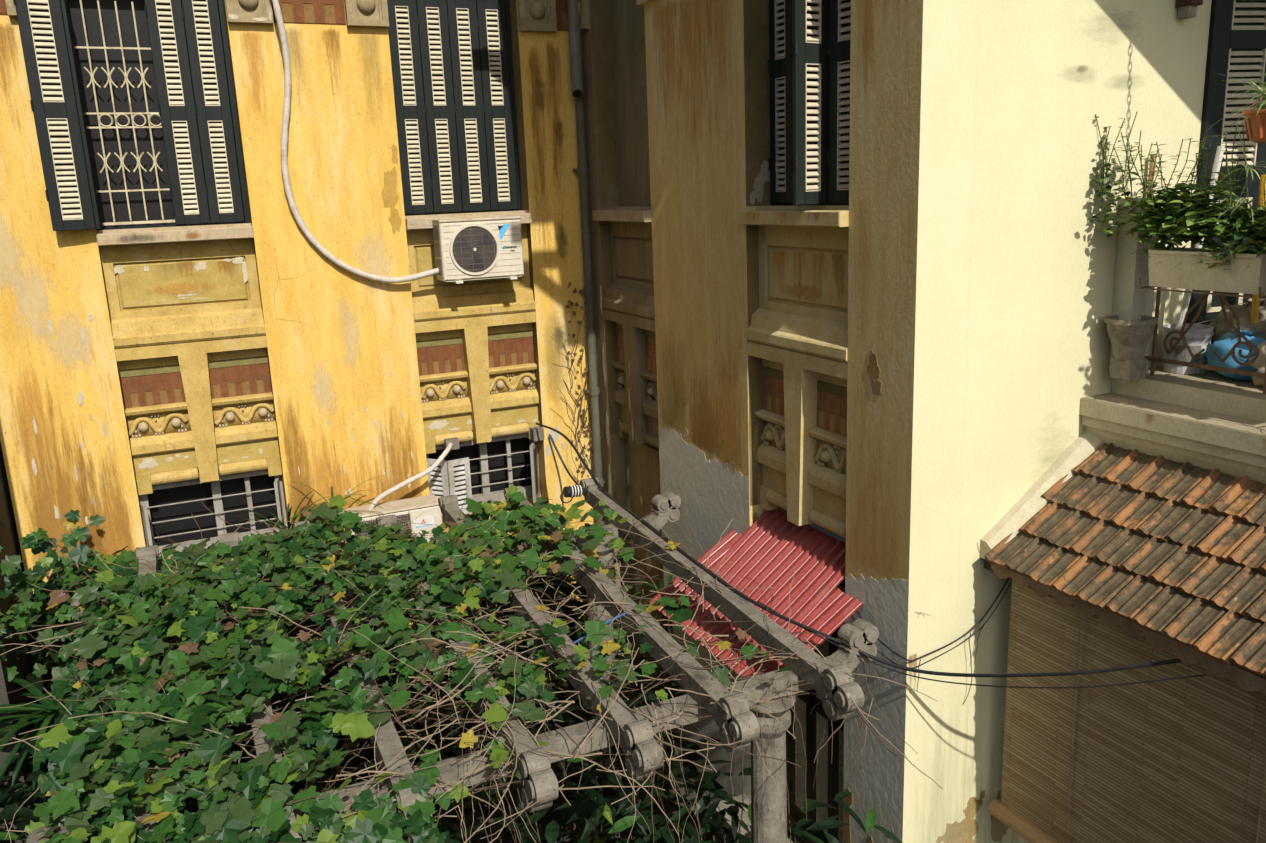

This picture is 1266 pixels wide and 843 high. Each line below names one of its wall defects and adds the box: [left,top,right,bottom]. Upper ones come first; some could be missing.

water stain [530,46,561,181]
peeling [749,160,770,204]
peeling [77,390,107,438]
peeling [936,788,1009,843]